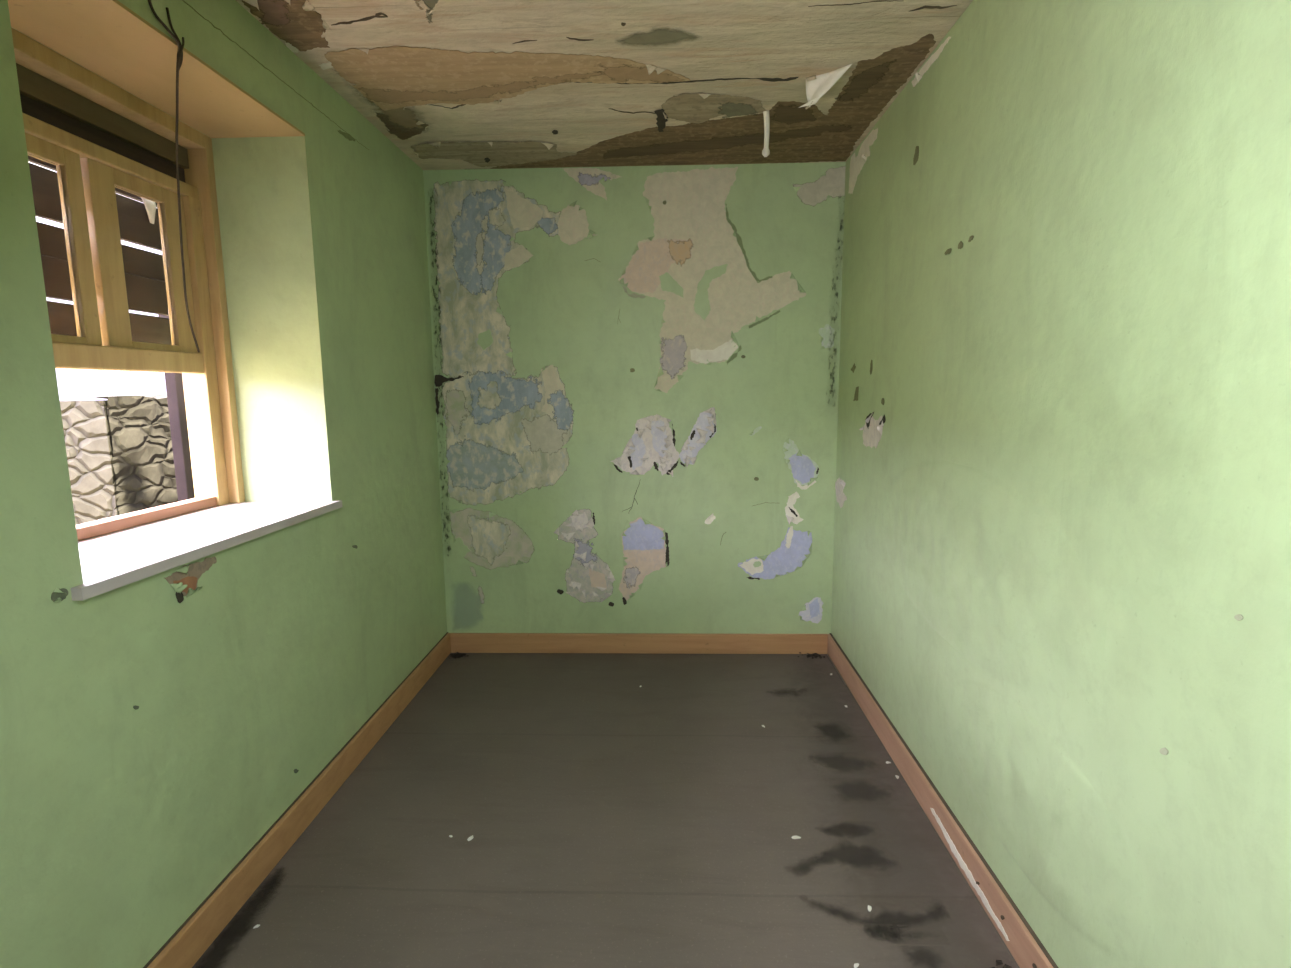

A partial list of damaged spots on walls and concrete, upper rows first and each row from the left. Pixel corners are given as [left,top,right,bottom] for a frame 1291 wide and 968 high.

peeling [242,0,951,580]
spalling [165,557,217,603]
peeling [554,509,670,607]